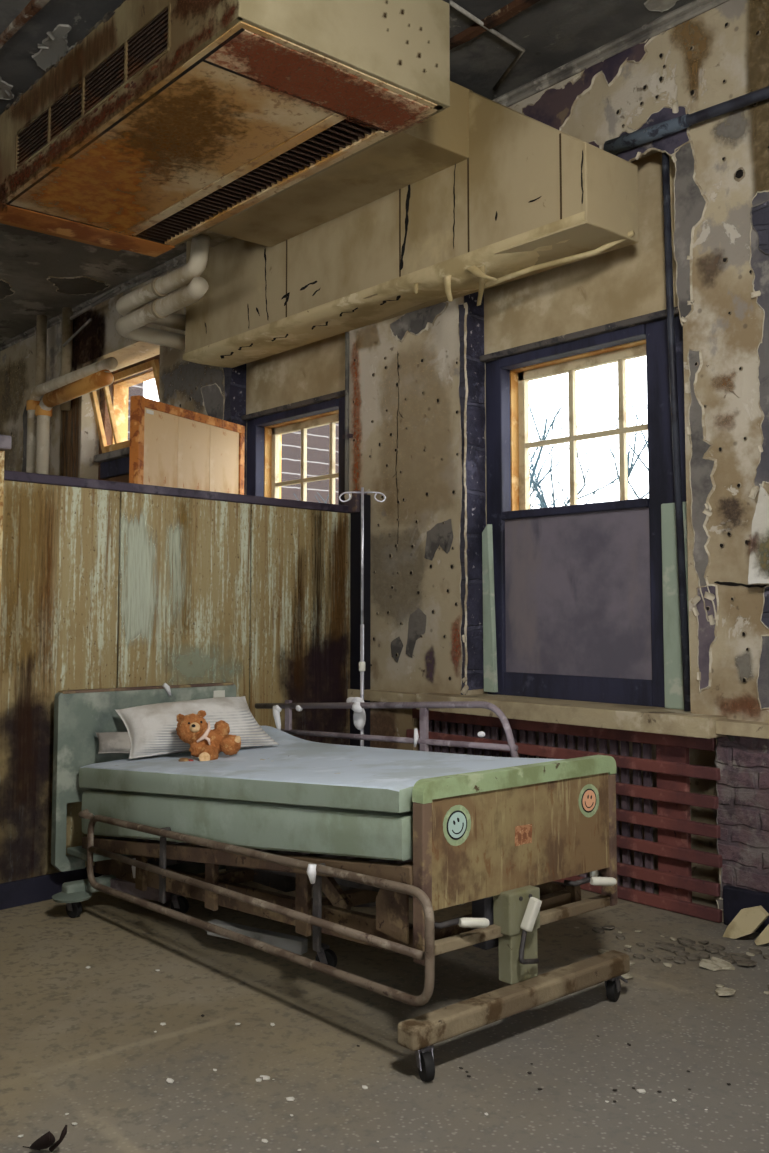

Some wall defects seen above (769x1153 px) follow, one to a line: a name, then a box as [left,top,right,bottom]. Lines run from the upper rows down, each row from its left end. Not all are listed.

peeling [0,76,14,100]
corrosion [0,0,427,211]
flaking render [522,31,709,326]
peeling [644,0,679,12]
spalling [734,167,745,182]
damp [281,510,350,745]
spalling [372,302,469,695]
flaking render [684,348,734,693]
flaking render [737,190,769,711]
damp [0,656,54,883]
flaking render [714,735,769,911]